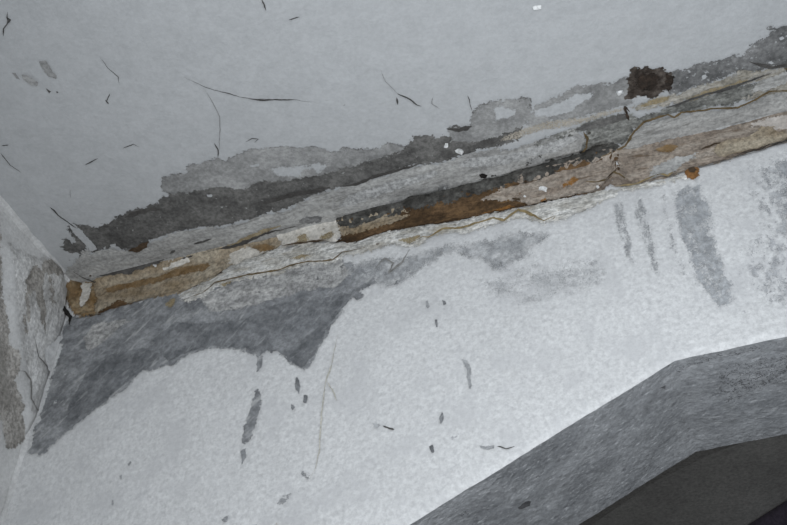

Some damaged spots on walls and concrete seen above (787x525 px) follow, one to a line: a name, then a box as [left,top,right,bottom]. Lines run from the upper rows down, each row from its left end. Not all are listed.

peeling [23,25,787,456]
rust [336,149,625,243]
water stain [612,196,660,276]
rust [684,166,700,180]
water stain [663,183,738,308]
water stain [740,157,787,306]
flaking render [0,256,26,449]